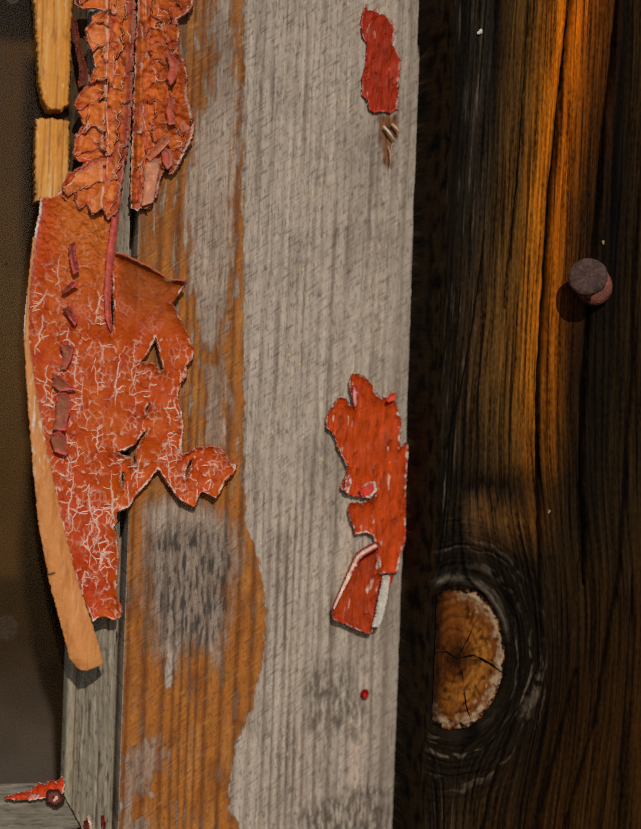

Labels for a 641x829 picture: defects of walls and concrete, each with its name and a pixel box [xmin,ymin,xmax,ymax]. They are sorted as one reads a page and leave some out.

peeling [360,4,401,167]
peeling [24,0,238,671]
peeling [326,373,409,634]
peeling [4,776,66,807]